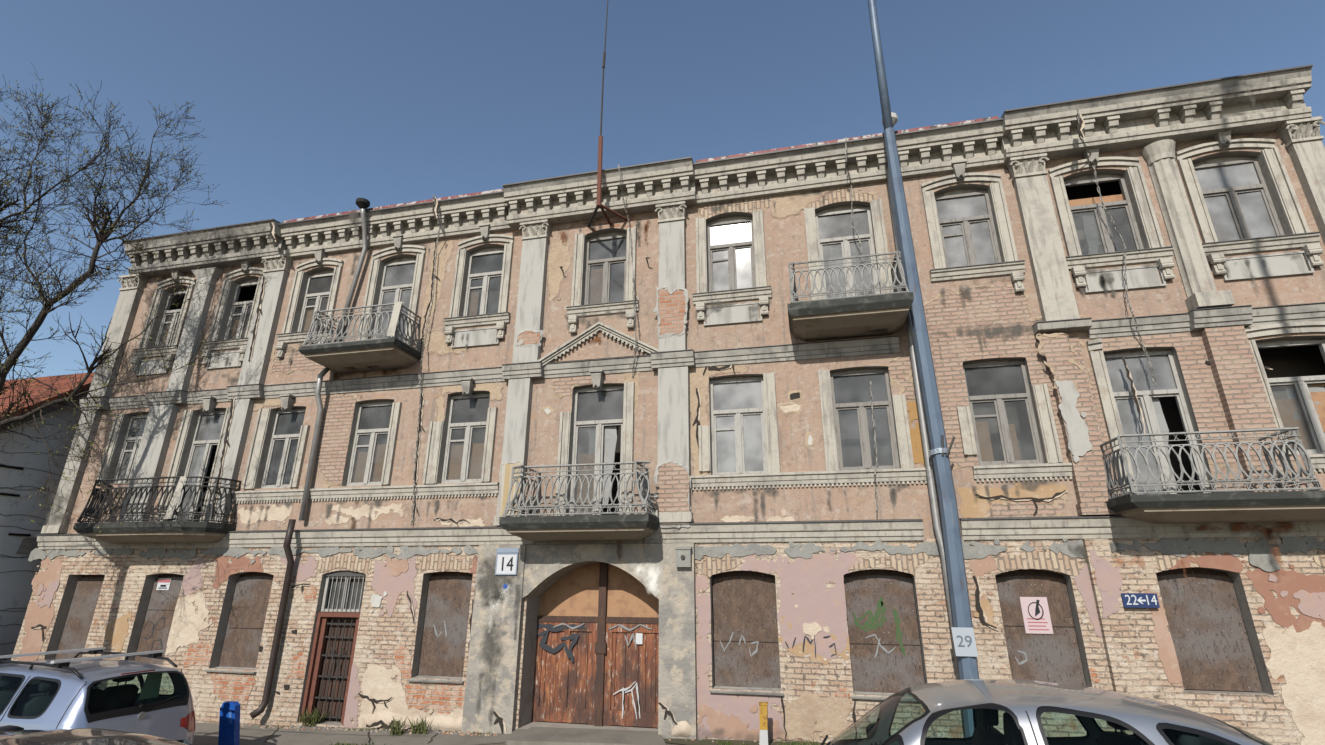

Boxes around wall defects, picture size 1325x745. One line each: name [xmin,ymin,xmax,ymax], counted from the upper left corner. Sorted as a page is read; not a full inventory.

flaking render [652,286,689,339]
flaking render [653,364,748,529]
flaking render [777,390,803,416]
flaking render [887,284,1236,470]
peeling [238,504,292,527]
flaking render [441,460,523,527]
peeling [721,509,795,522]
peeling [957,483,1068,520]
peeling [16,537,478,701]
peeling [344,641,466,729]
peeling [695,541,941,742]
peeling [962,536,1325,745]